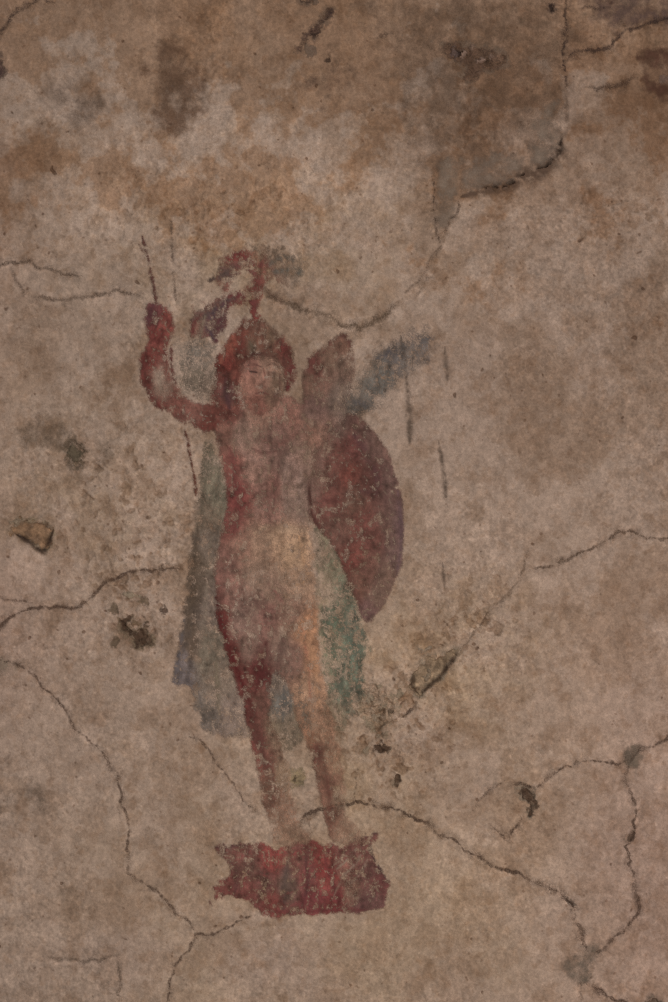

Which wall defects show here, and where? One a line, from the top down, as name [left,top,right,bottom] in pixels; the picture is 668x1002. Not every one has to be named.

crack [562,8,668,81]
spalling [9,516,56,552]
crack [0,567,176,628]
spalling [108,592,156,650]
spalling [515,784,539,819]
crack [302,792,641,951]
crack [140,881,250,997]